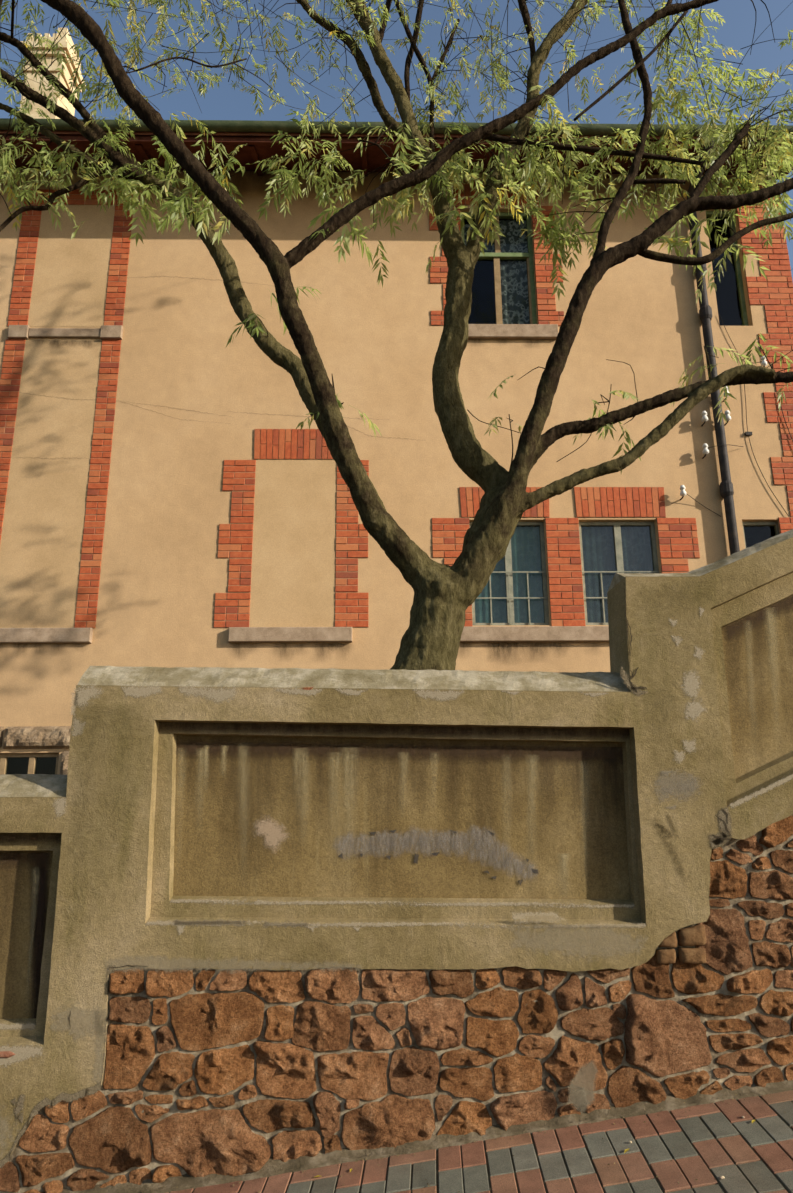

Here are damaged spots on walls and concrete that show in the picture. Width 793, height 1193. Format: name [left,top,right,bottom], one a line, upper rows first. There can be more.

spalling [709,774,793,848]
peeling [255,819,288,852]
spalling [655,925,706,964]